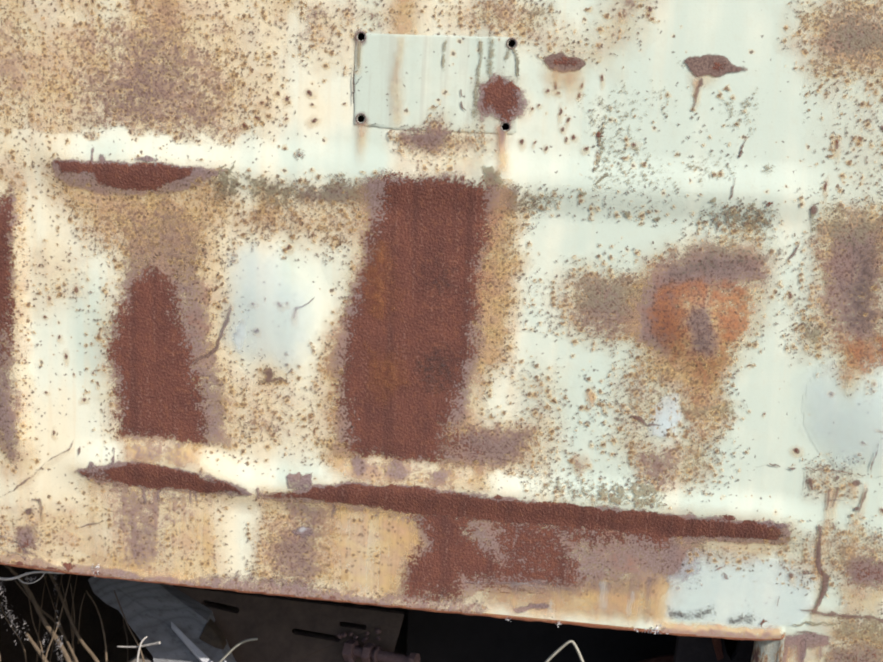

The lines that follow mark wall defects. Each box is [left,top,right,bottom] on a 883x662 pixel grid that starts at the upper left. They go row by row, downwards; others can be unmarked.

rust [0,0,427,148]
rust [777,0,883,131]
rust [810,118,883,174]
rust [565,449,590,476]